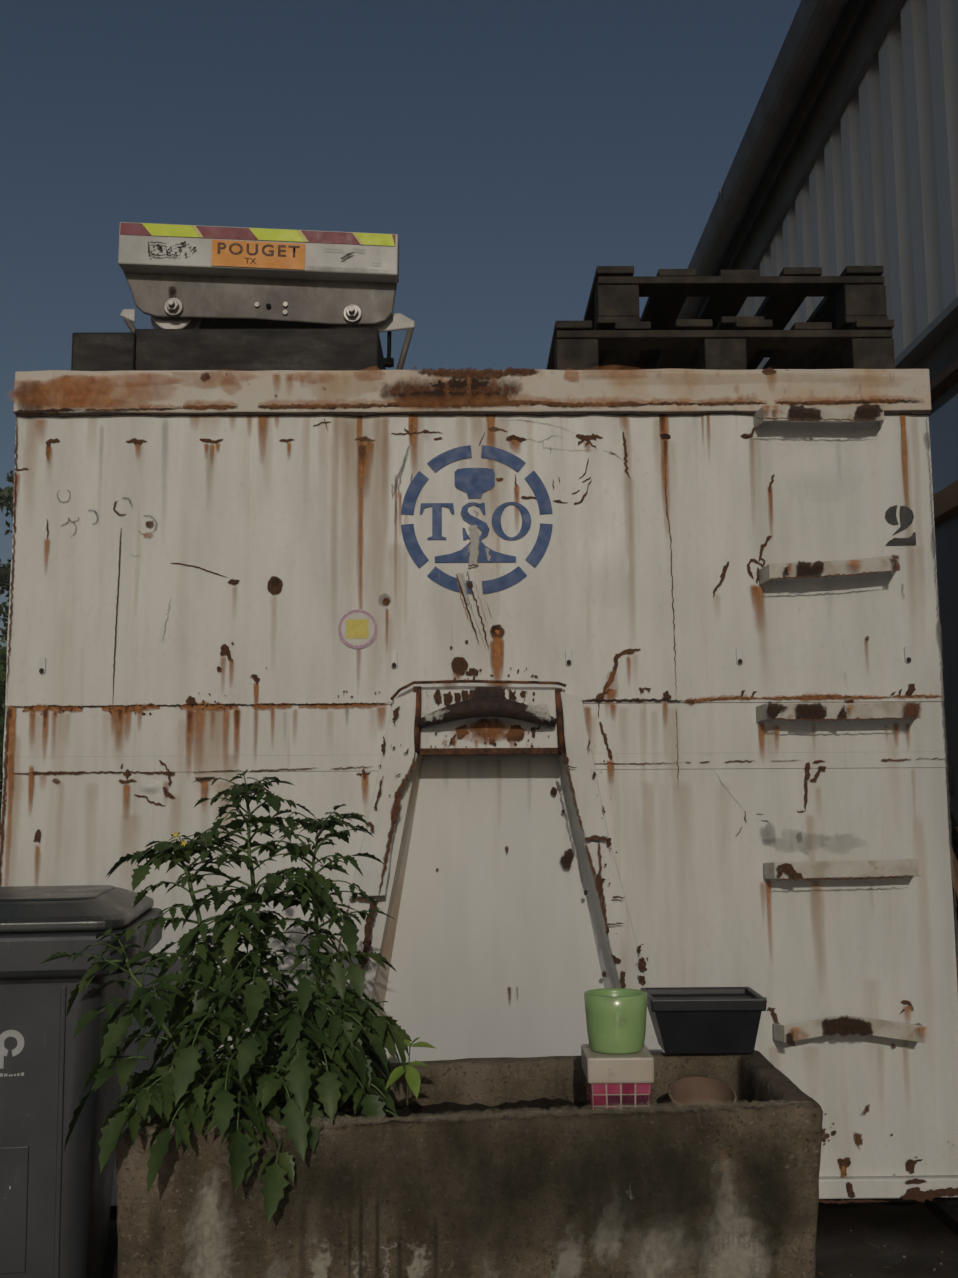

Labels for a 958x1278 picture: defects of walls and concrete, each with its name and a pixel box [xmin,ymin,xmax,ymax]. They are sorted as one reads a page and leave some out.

rust [0,366,948,884]
rust [338,753,416,970]
rust [562,753,624,926]
rust [767,875,916,913]
rust [765,997,799,1035]
rust [819,1178,958,1204]